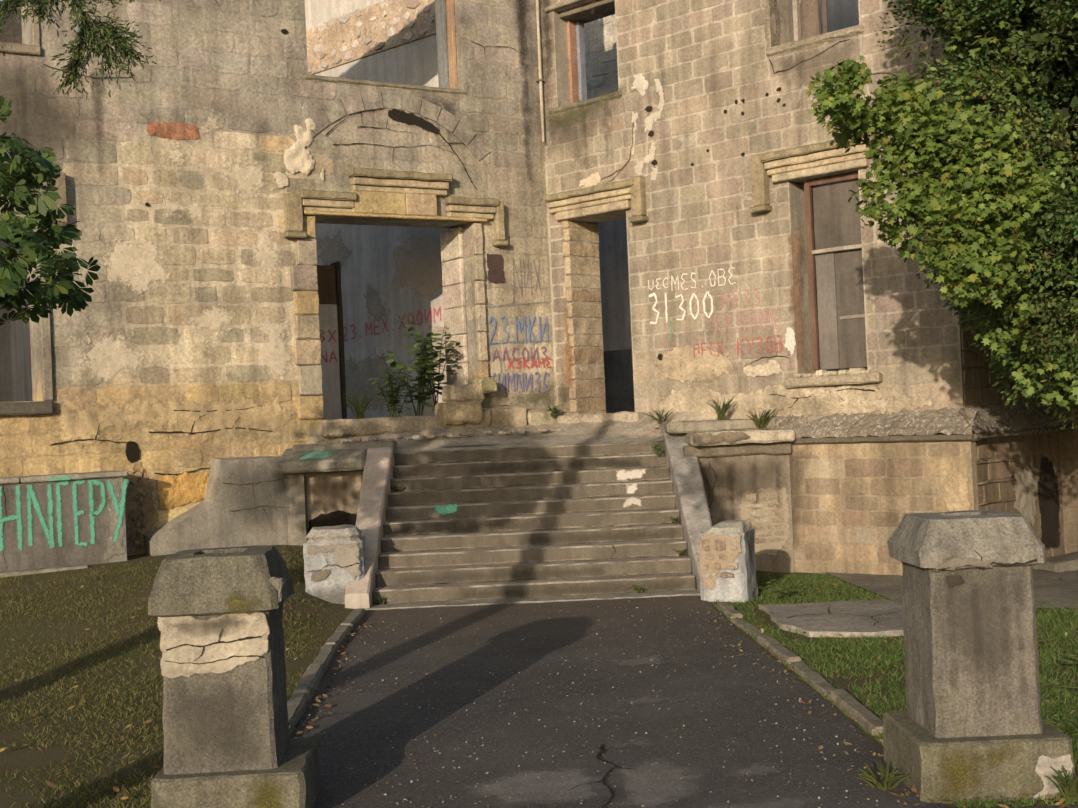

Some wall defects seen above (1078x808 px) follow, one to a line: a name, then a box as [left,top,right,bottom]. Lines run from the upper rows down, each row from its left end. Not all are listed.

flaking render [220,118,325,200]
crack [325,108,477,190]
flaking render [631,73,665,181]
flaking render [364,232,442,320]
flaking render [784,327,796,356]
spalling [654,345,932,419]
crack [50,405,273,446]
peeling [307,510,361,582]
flaking render [699,486,790,590]
spalling [1013,457,1060,549]
crack [164,628,264,664]
crack [567,744,637,808]